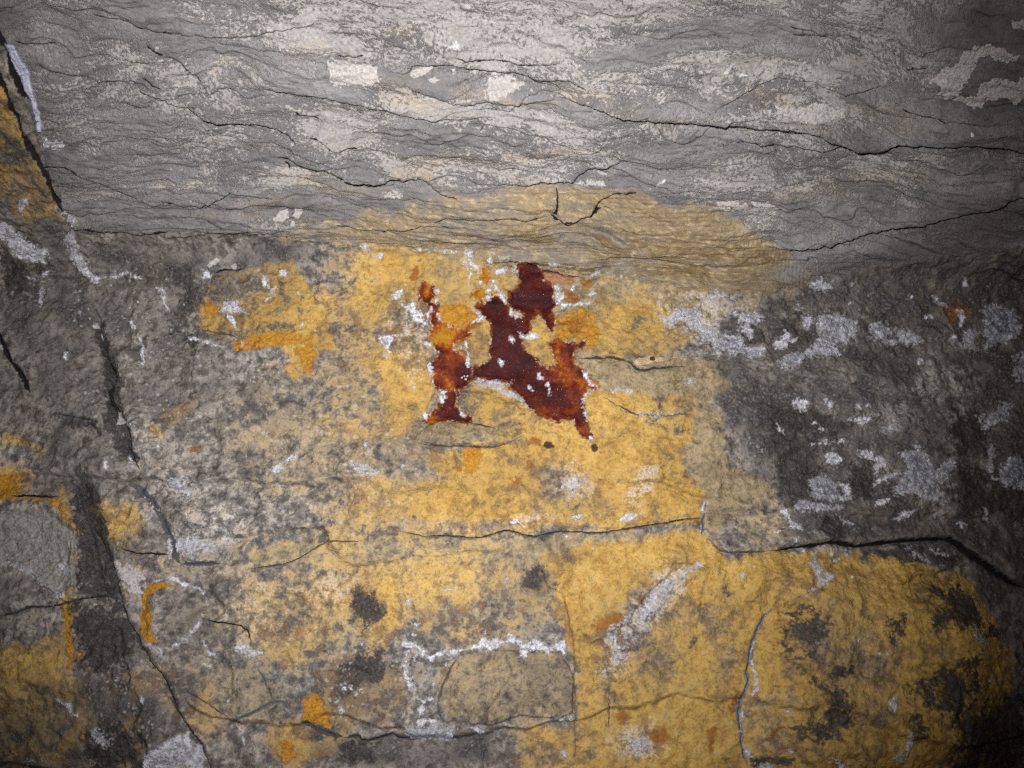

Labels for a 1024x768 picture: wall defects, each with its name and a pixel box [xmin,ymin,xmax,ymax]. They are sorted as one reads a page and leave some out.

crack [139,78,637,232]
crack [407,58,1024,154]
rust [410,261,600,452]
damp [663,289,922,369]
damp [924,295,1022,353]
crack [56,331,220,566]
crack [402,501,1024,588]
damp [750,392,1024,590]